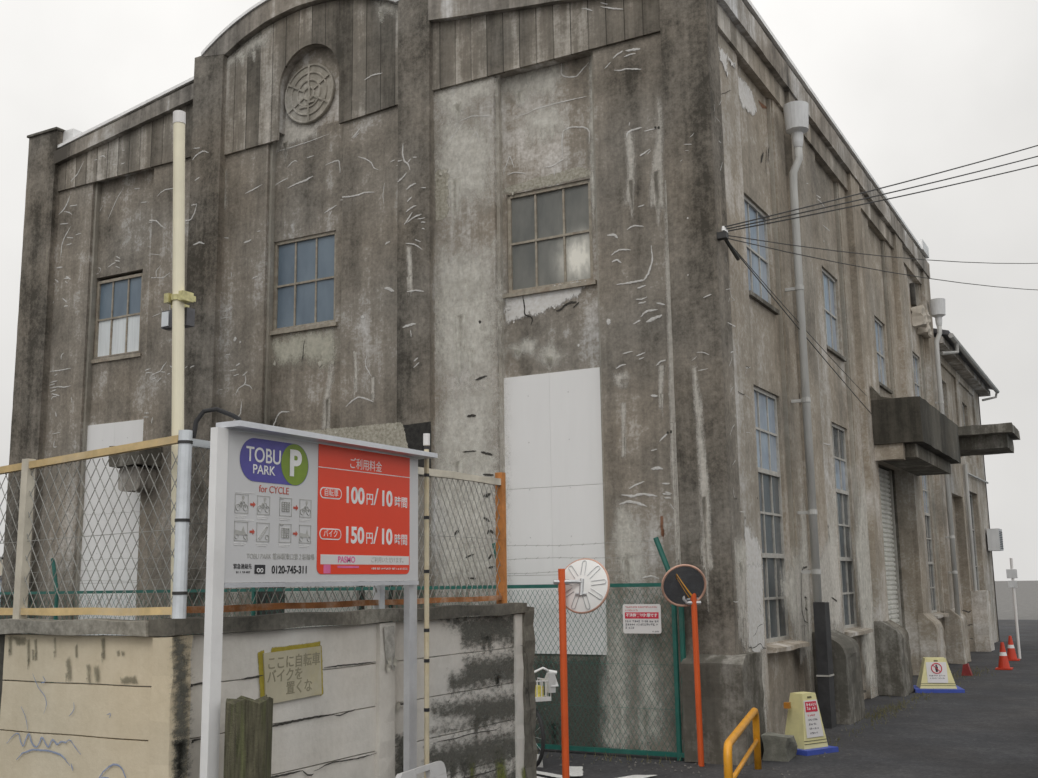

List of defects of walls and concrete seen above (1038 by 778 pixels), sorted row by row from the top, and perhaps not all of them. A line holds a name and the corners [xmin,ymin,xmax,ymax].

peeling [718,46,757,116]
peeling [504,280,586,323]
crack [523,299,579,324]
damp [172,637,193,778]
mould [429,615,516,778]